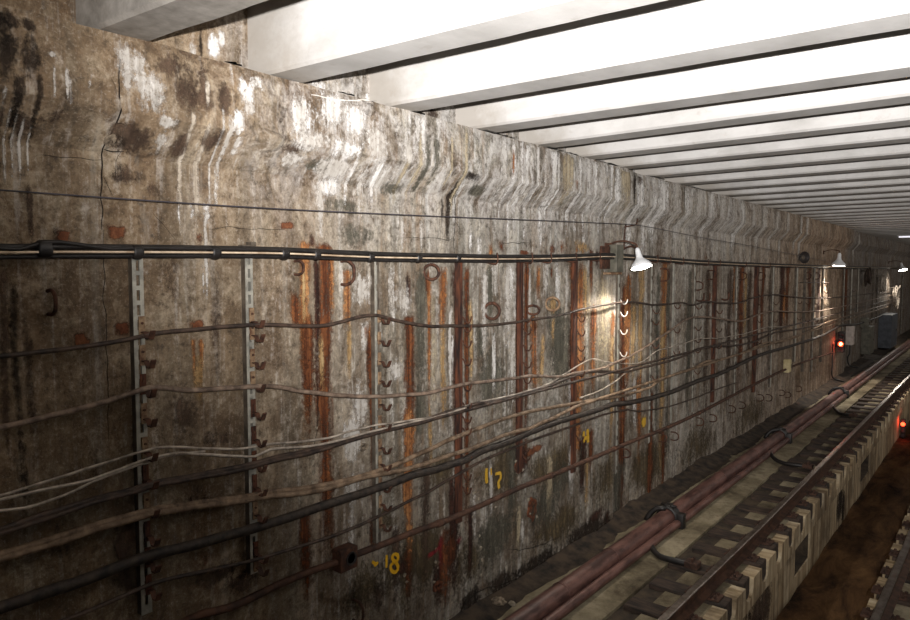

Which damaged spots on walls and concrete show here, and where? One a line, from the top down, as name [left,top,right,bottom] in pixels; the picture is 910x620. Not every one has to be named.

water stain [0,11,64,179]
water stain [53,68,73,104]
crack [47,59,129,438]
water stain [110,31,263,245]
rust [291,236,352,604]
water stain [279,82,440,244]
rust [395,317,416,596]
rust [425,269,473,606]
water stain [441,133,485,235]
rust [515,250,556,426]
rust [568,241,598,502]
rust [609,260,668,509]